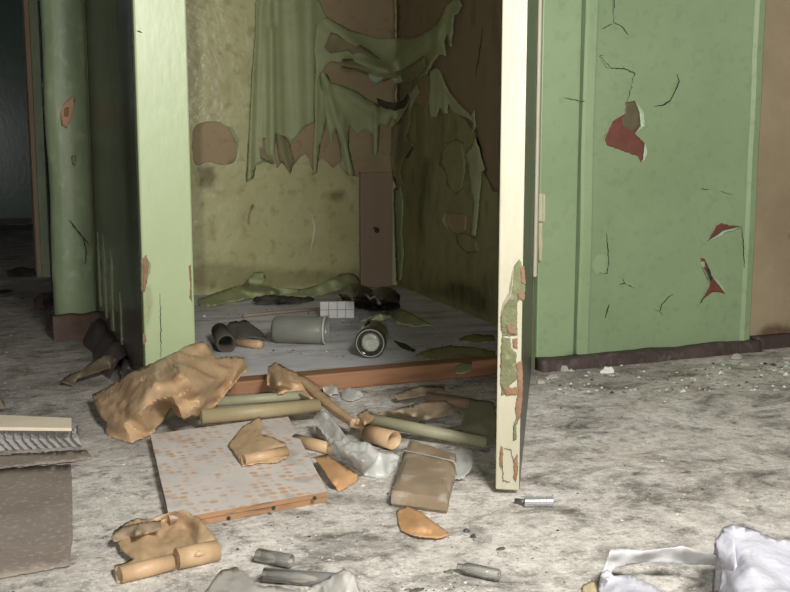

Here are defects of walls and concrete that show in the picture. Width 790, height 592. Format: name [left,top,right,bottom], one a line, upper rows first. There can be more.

crack [602,0,628,34]
peeling [60,96,76,128]
peeling [192,0,502,282]
crack [600,55,635,101]
peeling [604,100,647,162]
crack [655,74,680,107]
crack [70,221,89,262]
peeling [707,223,740,242]
peeling [699,258,726,304]
peeling [416,260,526,441]